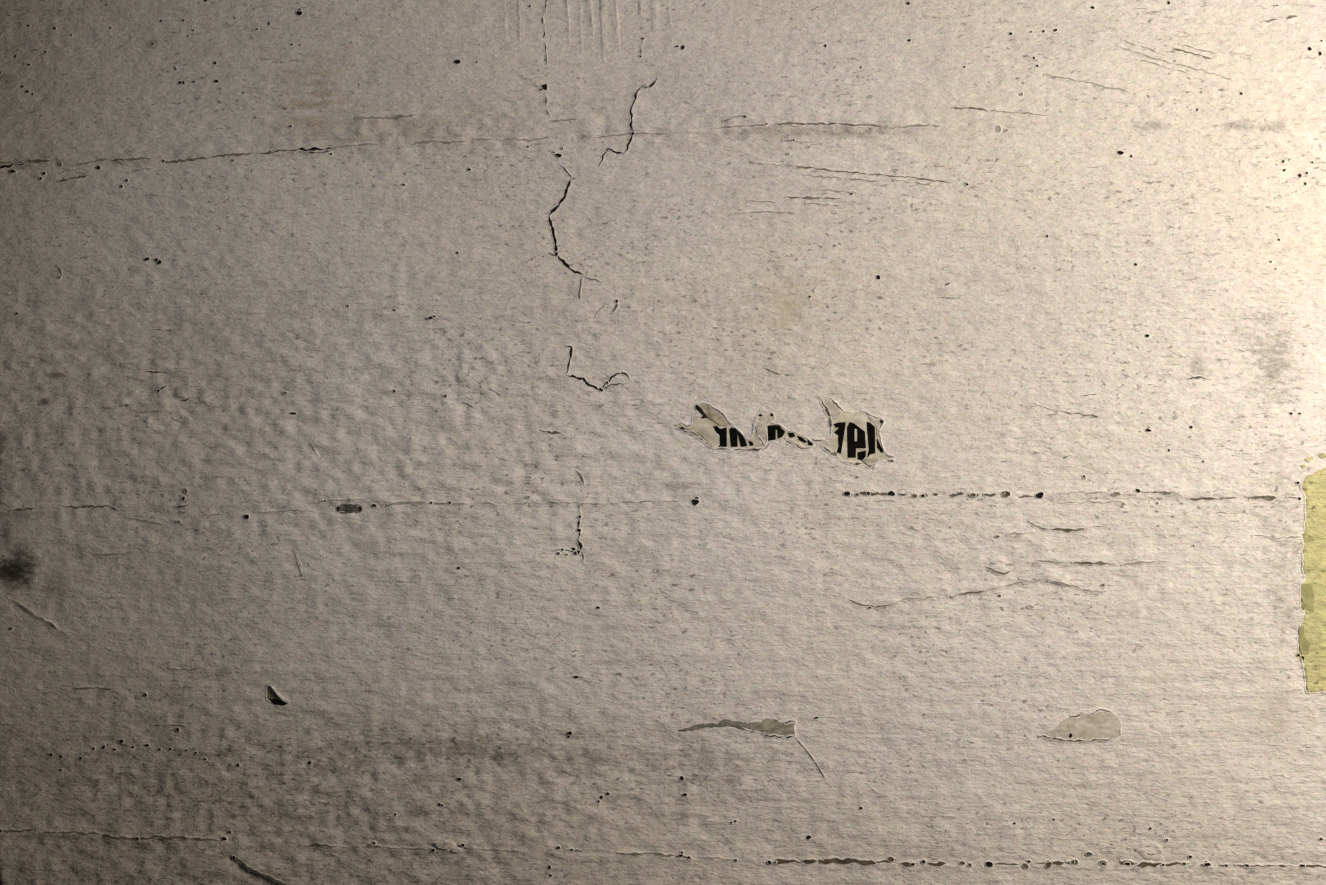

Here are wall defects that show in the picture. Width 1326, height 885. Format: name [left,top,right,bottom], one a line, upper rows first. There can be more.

crack [0,0,664,315]
crack [565,344,631,393]
peeling [675,394,896,470]
spalling [265,684,290,708]
spalling [678,717,827,781]
spalling [1036,707,1122,744]